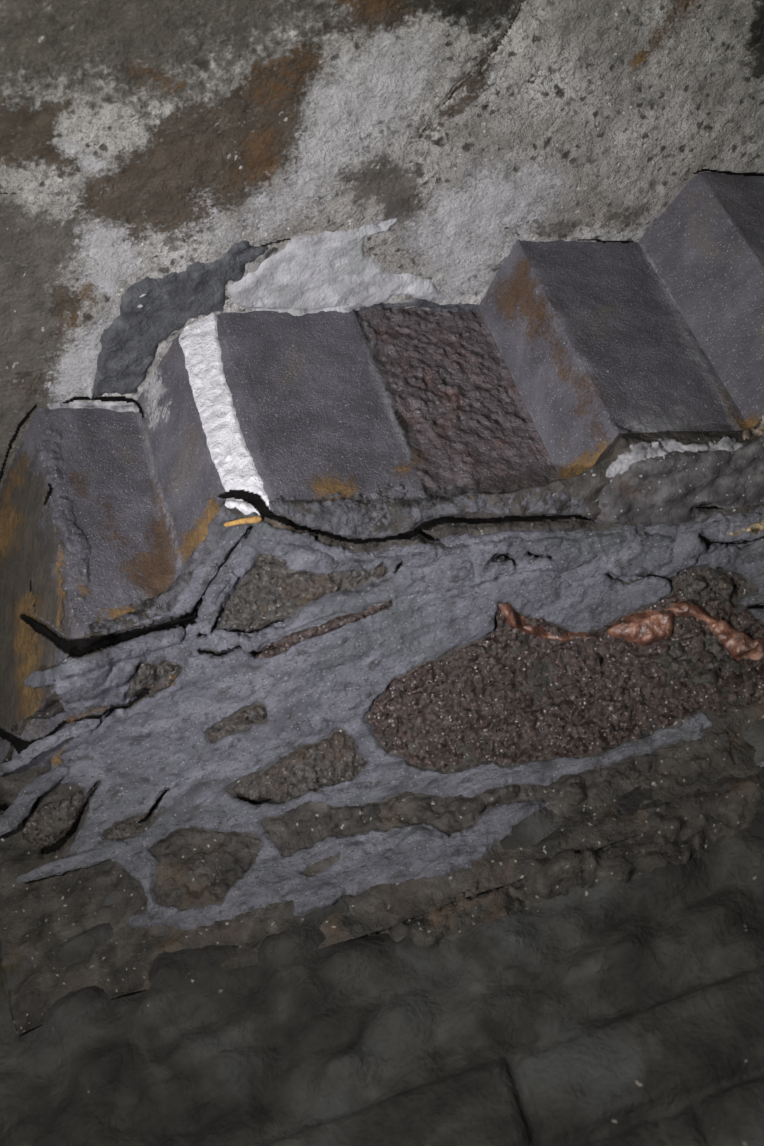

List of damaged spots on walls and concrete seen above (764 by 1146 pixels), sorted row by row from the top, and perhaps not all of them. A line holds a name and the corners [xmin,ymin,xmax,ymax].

leakage [745,0,764,82]
leakage [0,0,651,402]
crack [0,404,36,482]
crack [63,396,143,418]
crack [217,490,597,550]
rust [14,592,45,719]
crack [19,580,283,658]
peeling [0,313,764,949]
crack [0,689,150,754]
crack [40,787,97,855]
crack [137,790,168,823]
crack [237,794,270,805]